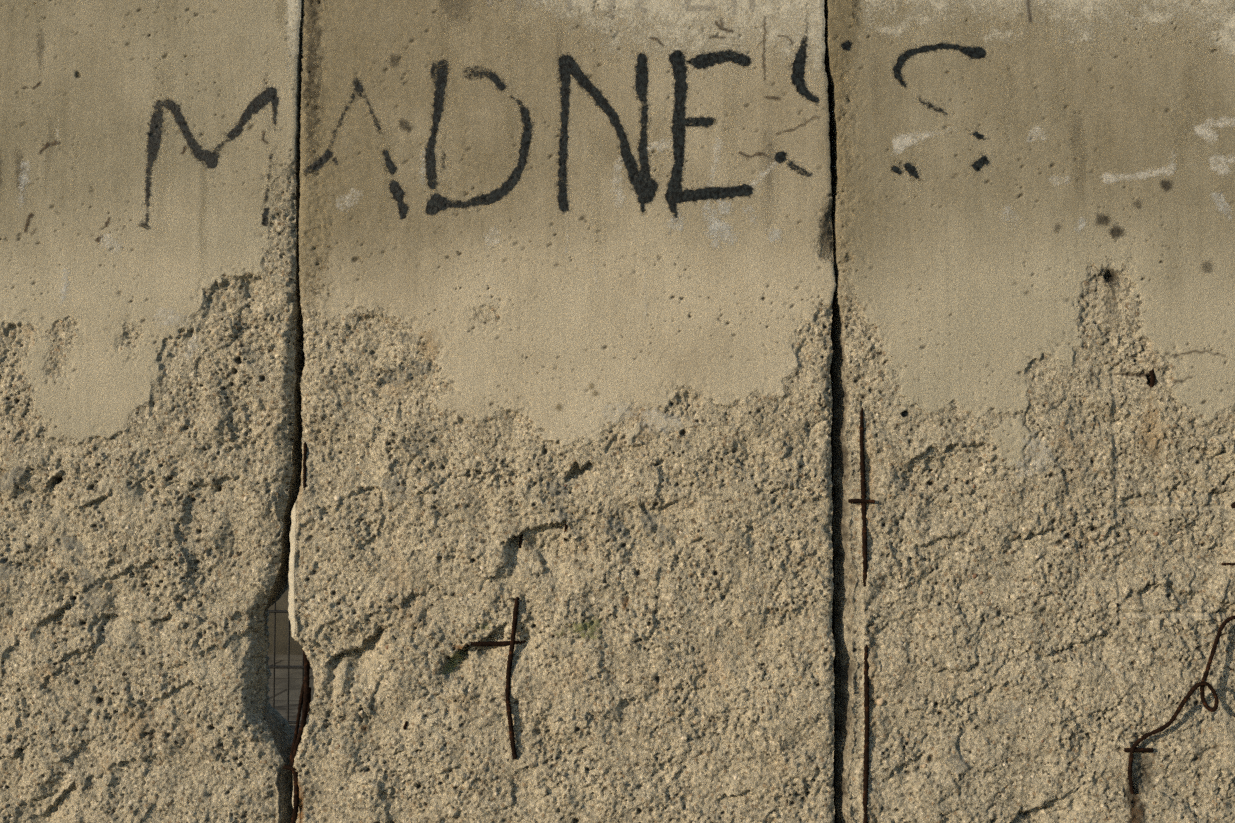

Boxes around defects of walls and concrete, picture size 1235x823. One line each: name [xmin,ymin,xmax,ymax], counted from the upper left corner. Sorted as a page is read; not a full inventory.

spalling [0,162,835,823]
spalling [816,186,1235,823]
rust [1124,762,1150,823]